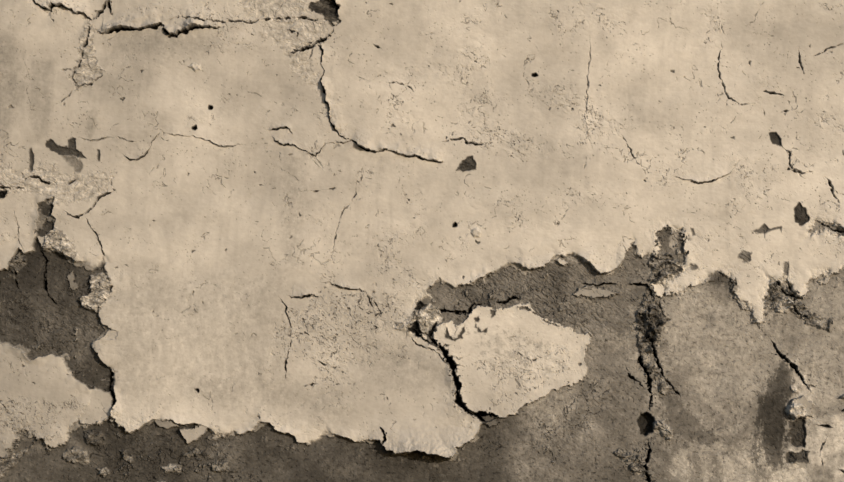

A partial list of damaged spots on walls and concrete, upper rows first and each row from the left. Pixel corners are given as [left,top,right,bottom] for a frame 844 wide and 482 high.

flaking render [238,0,477,173]
spalling [45,137,87,159]
peeling [118,125,253,163]
spalling [769,132,783,147]
crack [781,145,844,205]
peeling [0,148,844,482]
crack [773,276,811,319]
crack [626,335,681,411]
water stain [659,270,844,482]
crack [771,340,822,394]
crack [640,437,653,482]
crack [815,409,844,474]